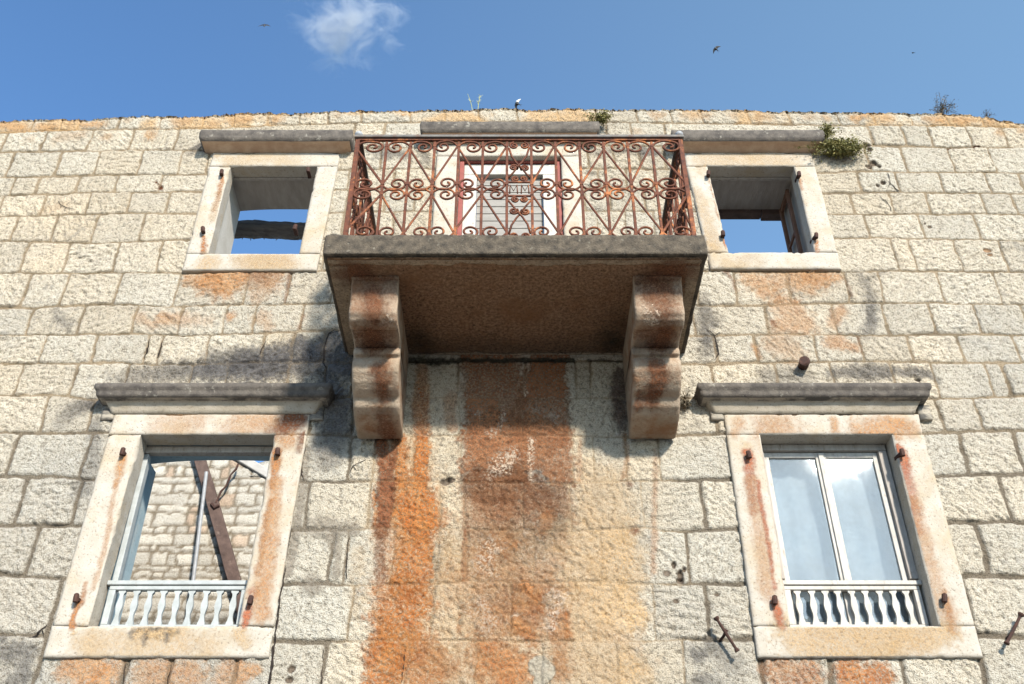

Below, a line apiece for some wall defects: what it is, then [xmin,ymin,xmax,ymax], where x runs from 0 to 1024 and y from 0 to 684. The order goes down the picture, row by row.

corrosion [853,416,910,481]
corrosion [242,414,308,628]
corrosion [361,370,445,684]
corrosion [743,449,785,629]
corrosion [69,583,86,629]
corrosion [475,620,536,684]
corrosion [836,660,894,684]